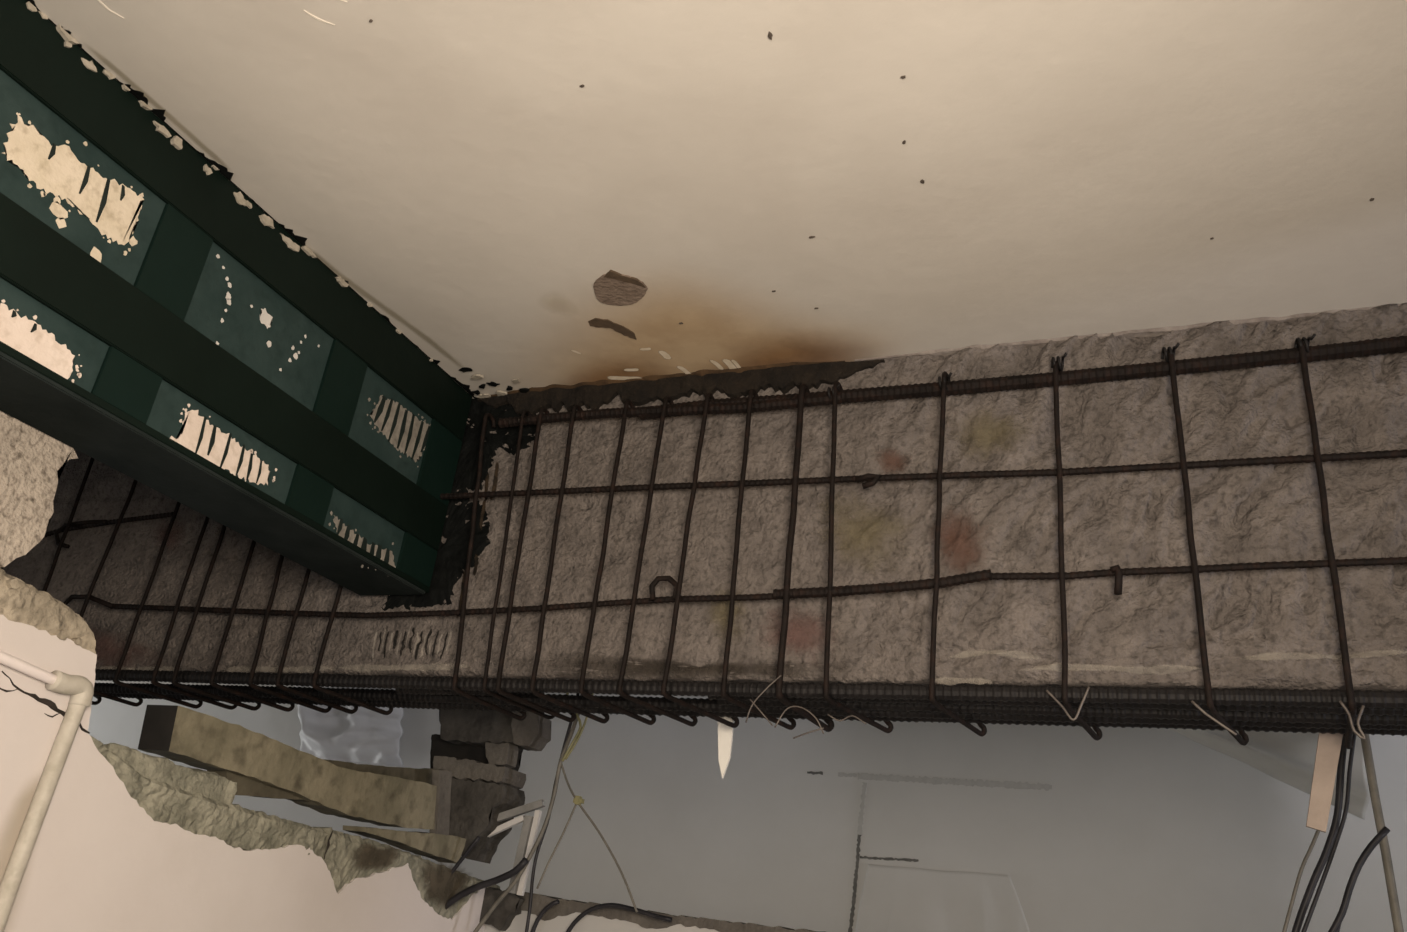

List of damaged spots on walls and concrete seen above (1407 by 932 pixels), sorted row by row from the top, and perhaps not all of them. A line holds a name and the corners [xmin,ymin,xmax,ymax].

peeling [26,1,183,150]
peeling [3,113,144,263]
peeling [233,191,317,258]
peeling [0,299,82,383]
peeling [216,254,232,323]
peeling [250,305,273,347]
spalling [588,270,648,340]
spalling [458,306,1407,428]
peeling [170,404,277,485]
peeling [367,395,431,467]
spalling [440,449,1407,500]
spalling [110,557,1407,618]